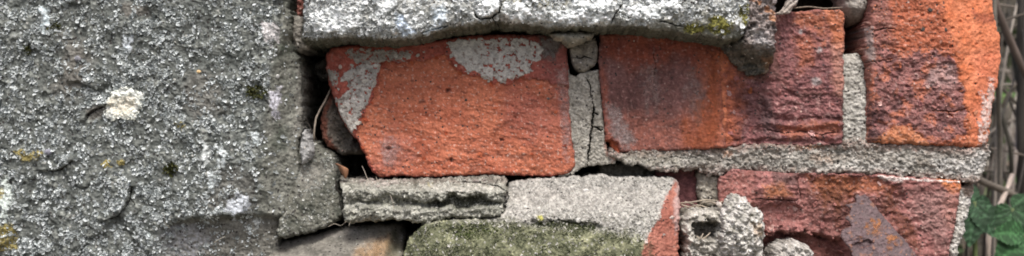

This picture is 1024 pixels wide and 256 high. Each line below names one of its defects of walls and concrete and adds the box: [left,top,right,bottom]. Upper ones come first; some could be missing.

crack [474,6,501,27]
crack [558,56,616,177]